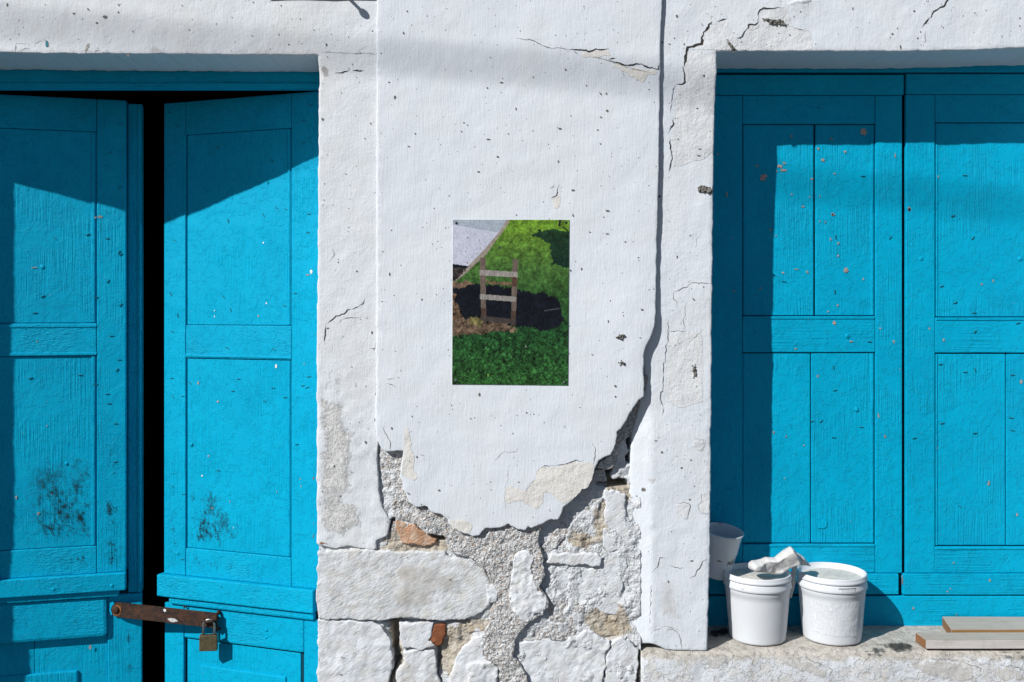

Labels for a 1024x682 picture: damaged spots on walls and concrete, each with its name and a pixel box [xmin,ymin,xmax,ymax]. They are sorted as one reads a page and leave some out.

crack [519,7,812,170]
crack [660,282,703,414]
flaking render [300,370,648,682]